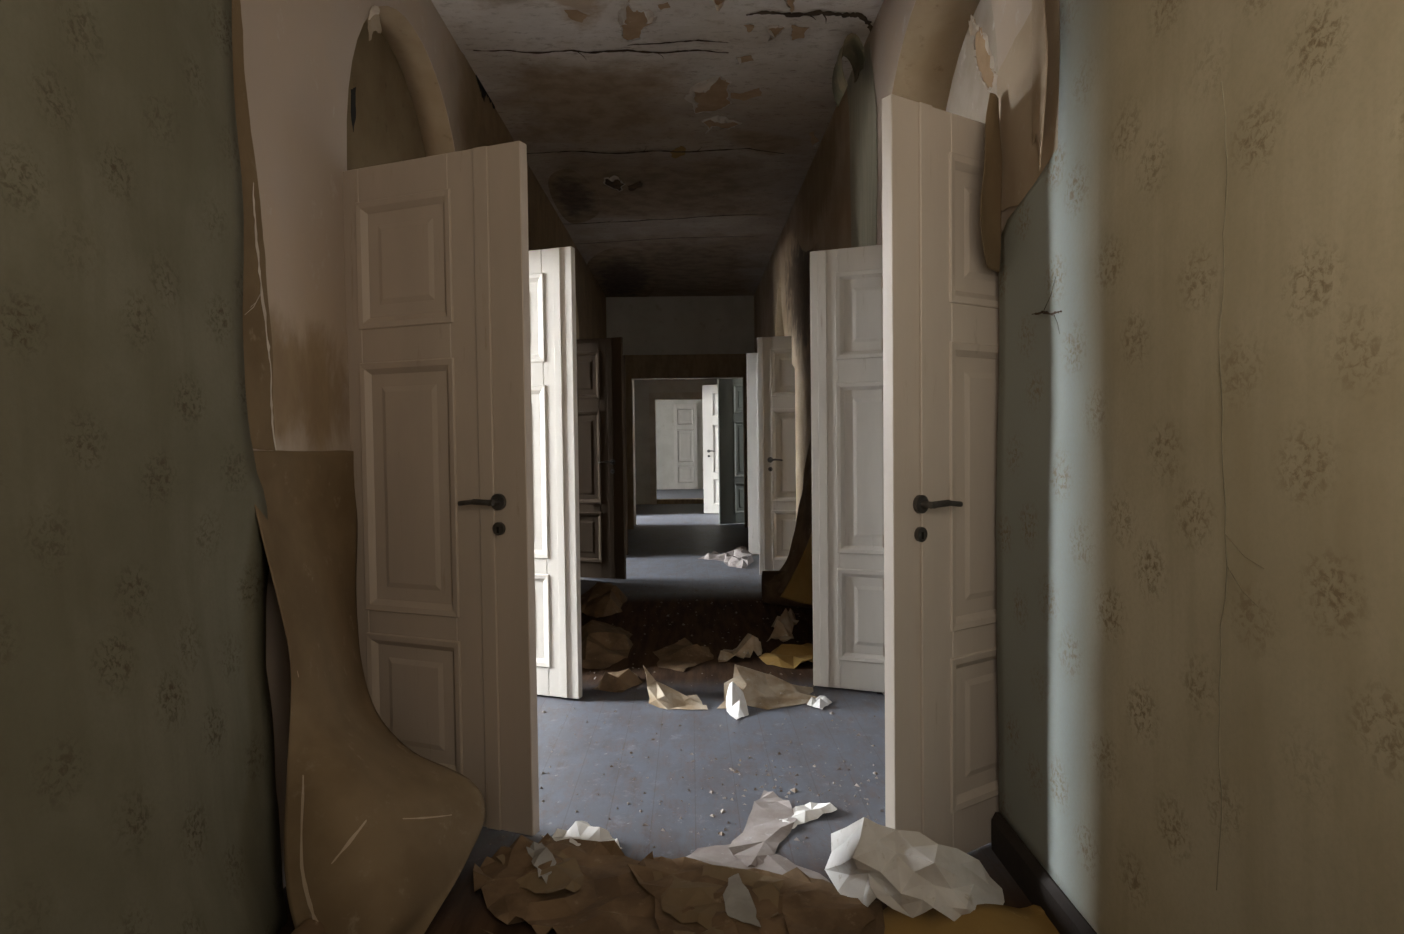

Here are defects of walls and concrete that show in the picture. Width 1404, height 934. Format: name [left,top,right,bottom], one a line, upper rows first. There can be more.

spalling [618,0,670,42]
spalling [744,0,809,41]
crack [473,10,873,109]